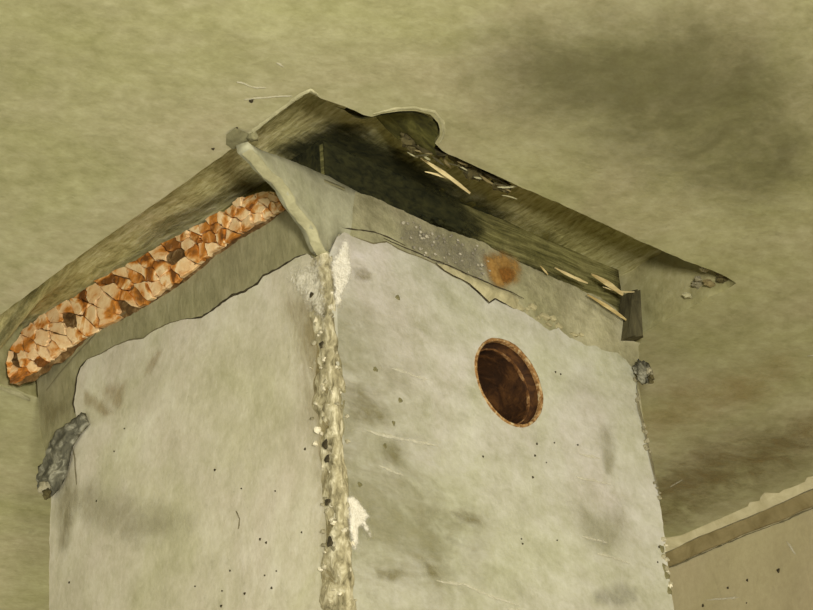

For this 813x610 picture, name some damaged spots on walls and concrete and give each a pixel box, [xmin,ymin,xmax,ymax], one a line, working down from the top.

damp [277,124,502,239]
spalling [336,106,517,199]
flaking render [401,221,584,337]
corrosion [485,253,520,287]
spalling [6,149,362,610]